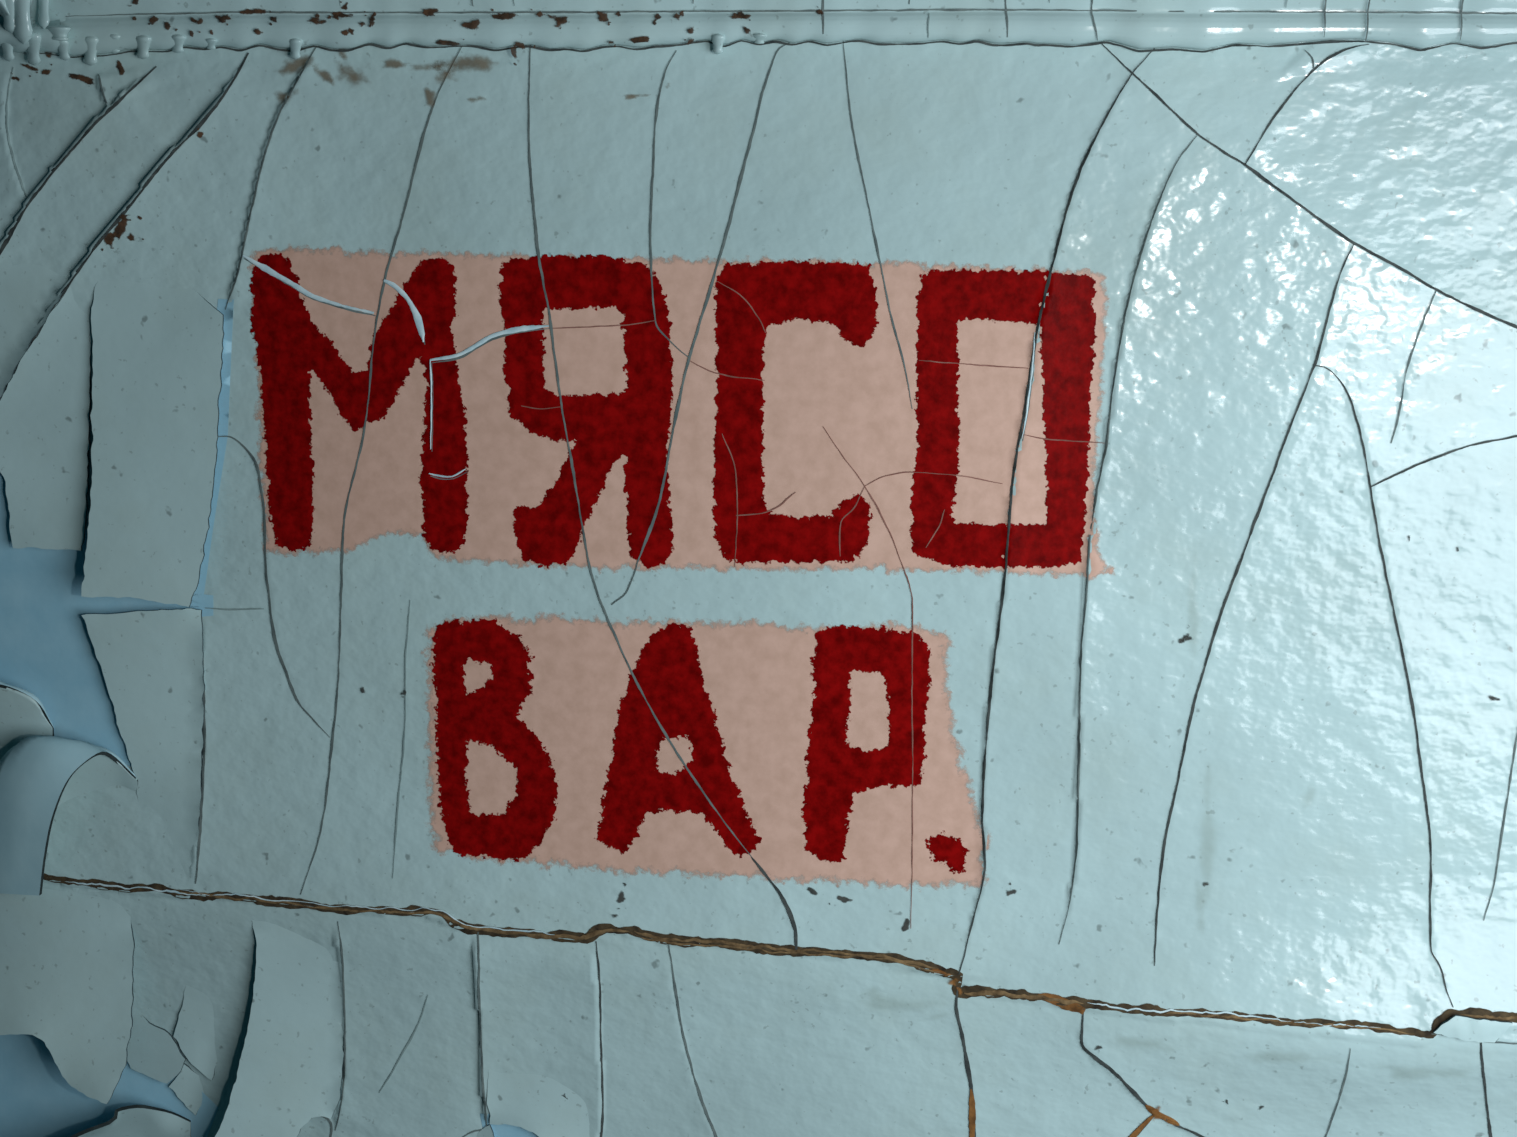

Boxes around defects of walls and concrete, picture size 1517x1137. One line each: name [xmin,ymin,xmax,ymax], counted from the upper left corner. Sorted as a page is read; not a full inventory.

rust [131,0,277,37]
rust [310,2,376,81]
rust [427,9,567,75]
rust [597,11,694,47]
rust [731,11,751,34]
crack [611,0,1517,605]
crack [218,43,511,895]
crack [959,74,1132,975]
crack [1090,44,1517,1006]
peeling [0,260,344,1137]
peeling [477,1068,589,1137]
crack [43,873,1517,1137]